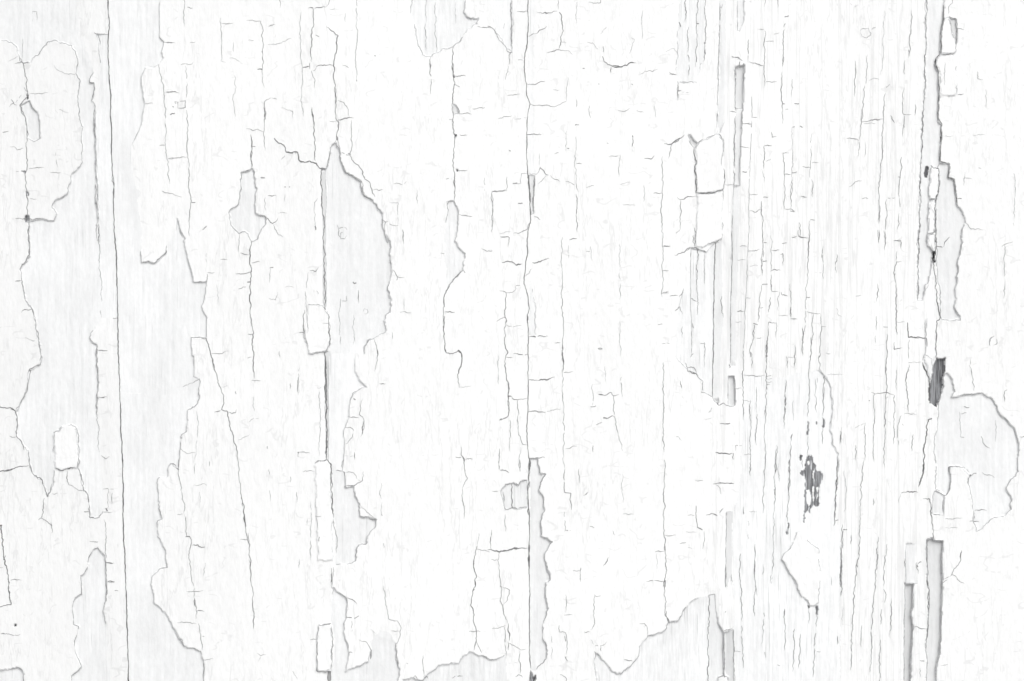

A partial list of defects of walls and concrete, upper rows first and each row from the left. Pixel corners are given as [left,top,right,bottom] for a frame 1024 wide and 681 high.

crack [0,0,207,681]
crack [169,0,428,678]
peeling [304,142,392,565]
crack [425,0,992,681]
peeling [594,0,842,681]
peeling [916,0,1020,532]
crack [959,336,1005,448]